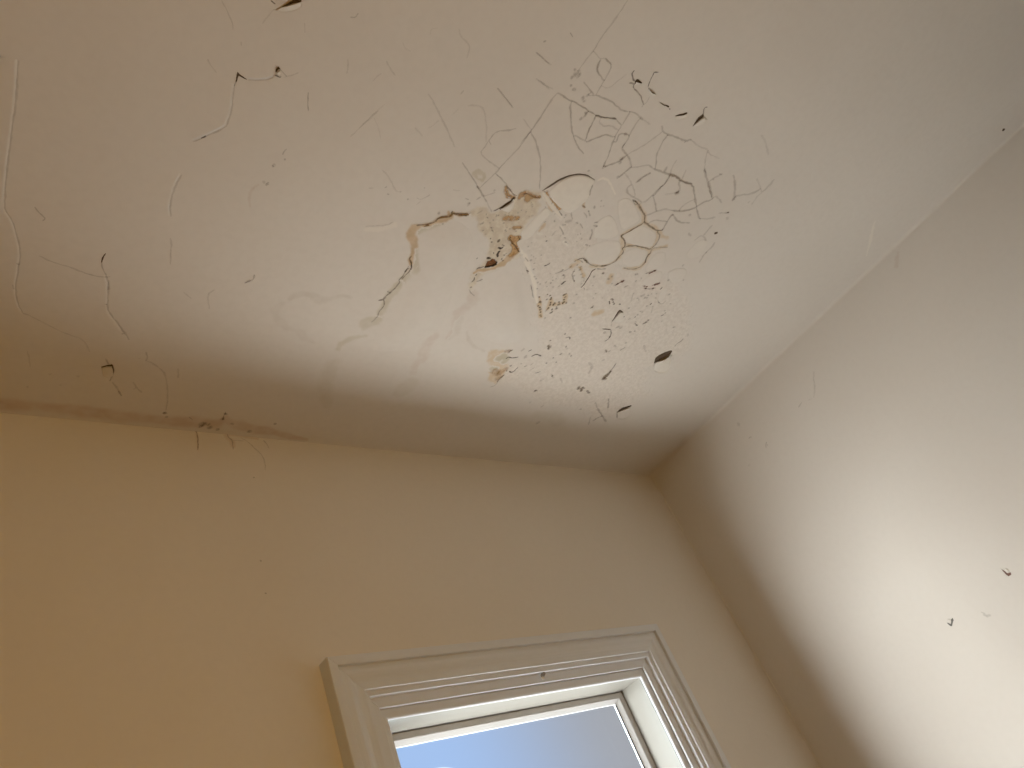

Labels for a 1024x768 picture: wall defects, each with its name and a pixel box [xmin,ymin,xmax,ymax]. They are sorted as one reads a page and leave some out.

spalling [466,174,666,292]
peeling [654,350,672,374]